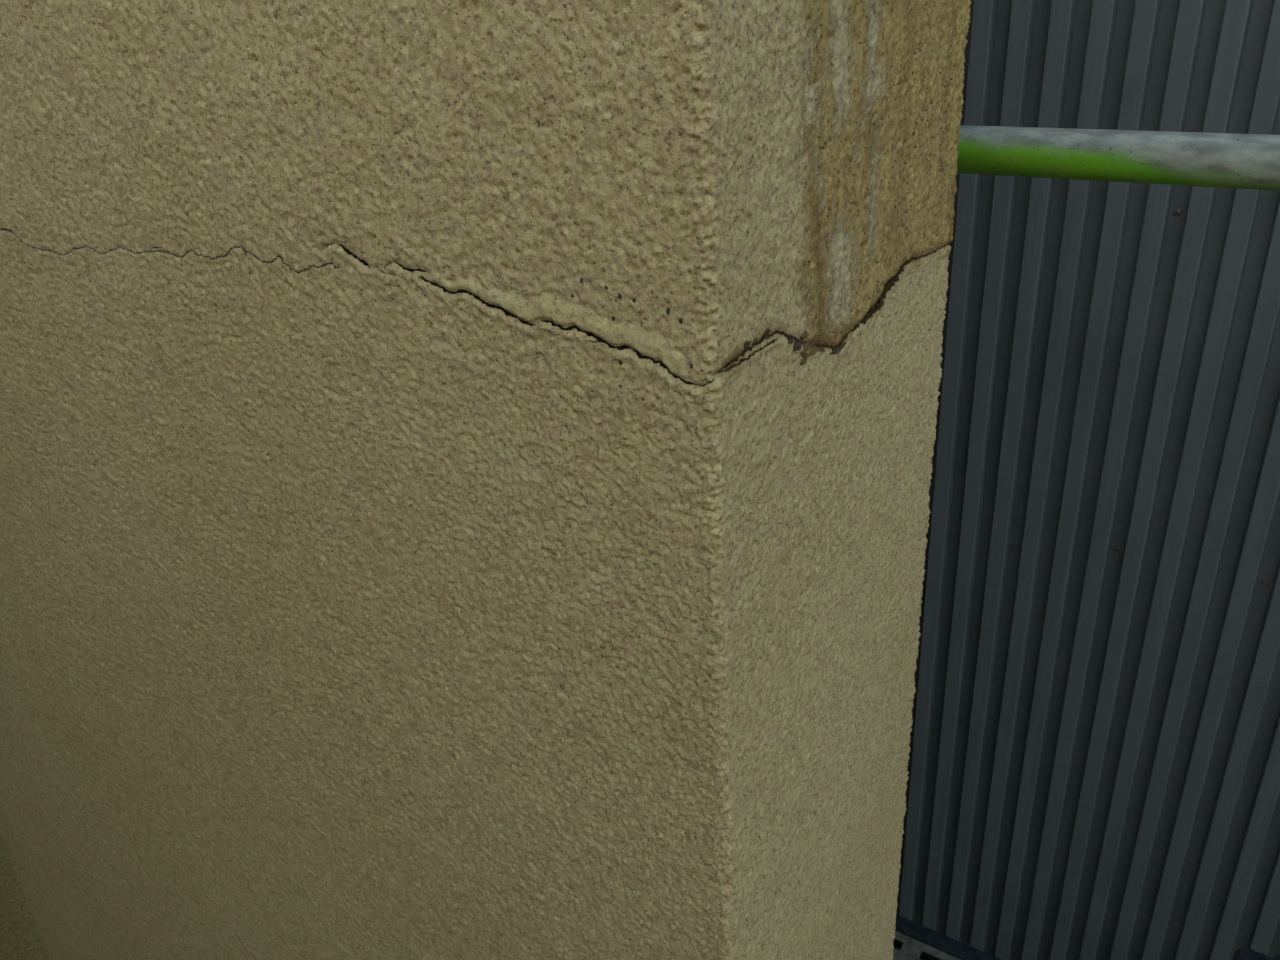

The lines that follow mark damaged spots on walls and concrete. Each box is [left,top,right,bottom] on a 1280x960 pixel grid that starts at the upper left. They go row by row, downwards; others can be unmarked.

crack [0,228,949,386]